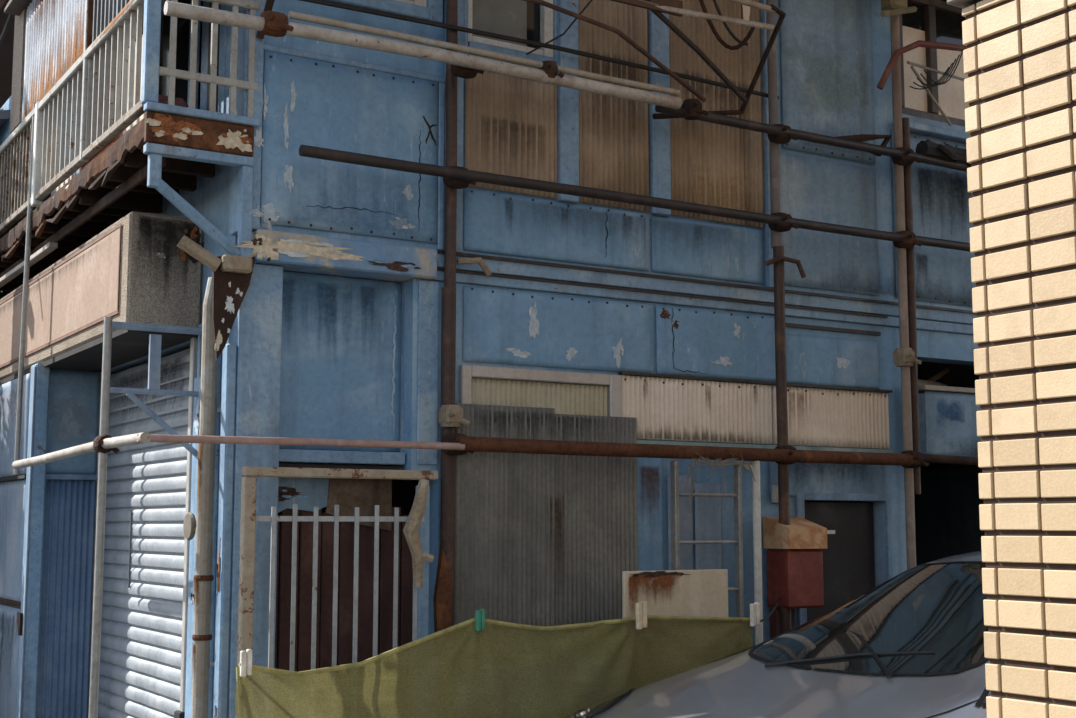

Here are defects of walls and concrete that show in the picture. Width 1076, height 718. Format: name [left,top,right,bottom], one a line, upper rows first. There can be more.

corrosion [24,28,84,119]
peeling [146,113,203,142]
peeling [216,84,269,152]
peeling [283,81,297,151]
leakage [141,218,197,268]
corrosion [185,224,204,248]
peeling [234,203,421,272]
peeling [215,281,243,351]
corrosion [629,575,675,608]